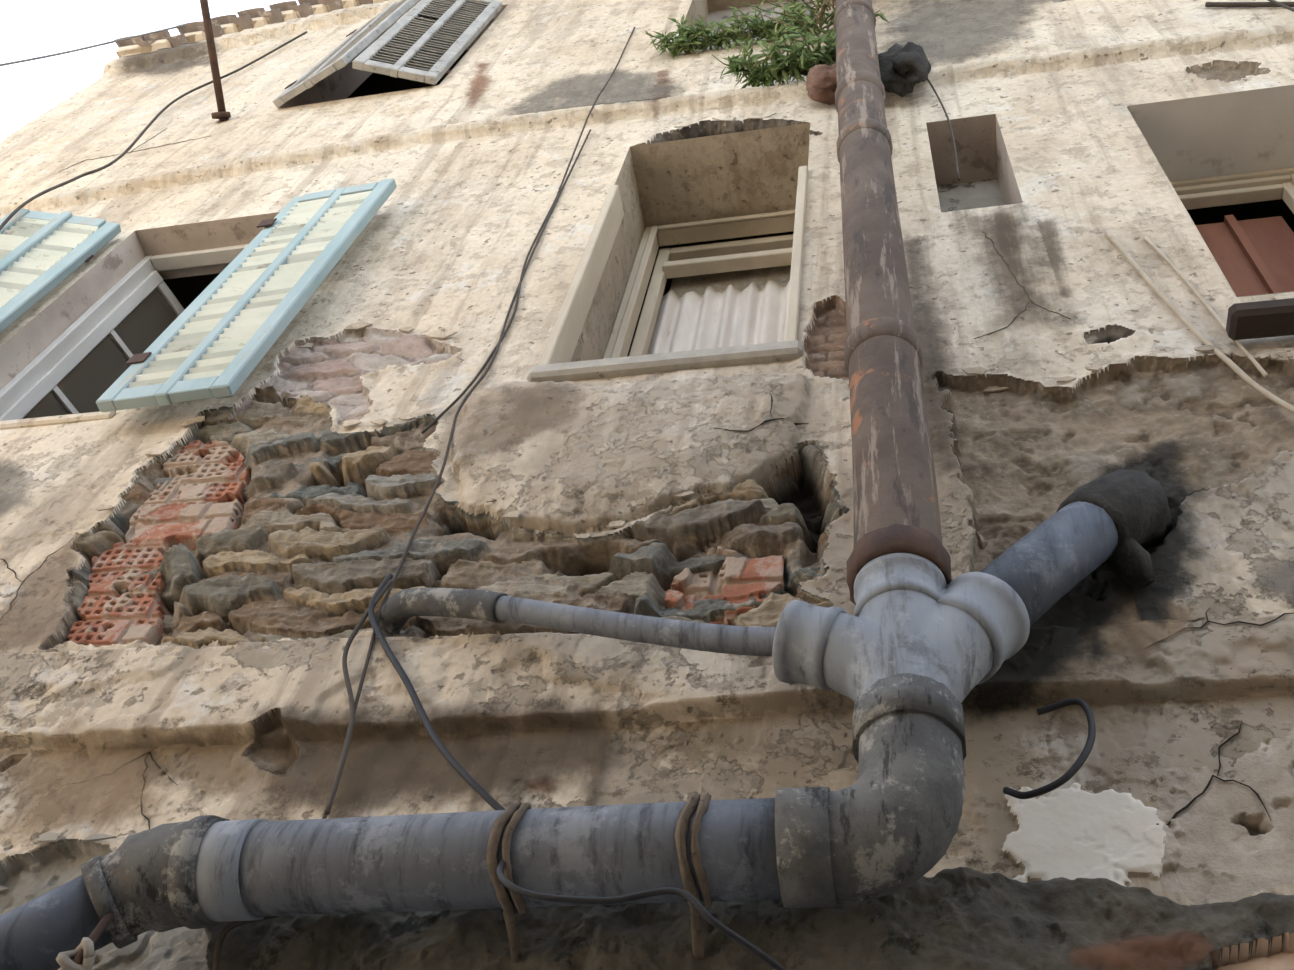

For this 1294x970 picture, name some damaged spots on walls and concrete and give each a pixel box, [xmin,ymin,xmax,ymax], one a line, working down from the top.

peeling [1186,60,1271,83]
spalling [804,295,849,380]
peeling [1084,324,1136,344]
spalling [41,321,850,650]
spalling [939,345,1294,572]
water stain [961,440,1202,716]
crack [120,751,177,829]
crack [1156,721,1271,825]
spalling [0,832,117,916]
spalling [91,926,212,970]
peeling [1212,932,1294,970]